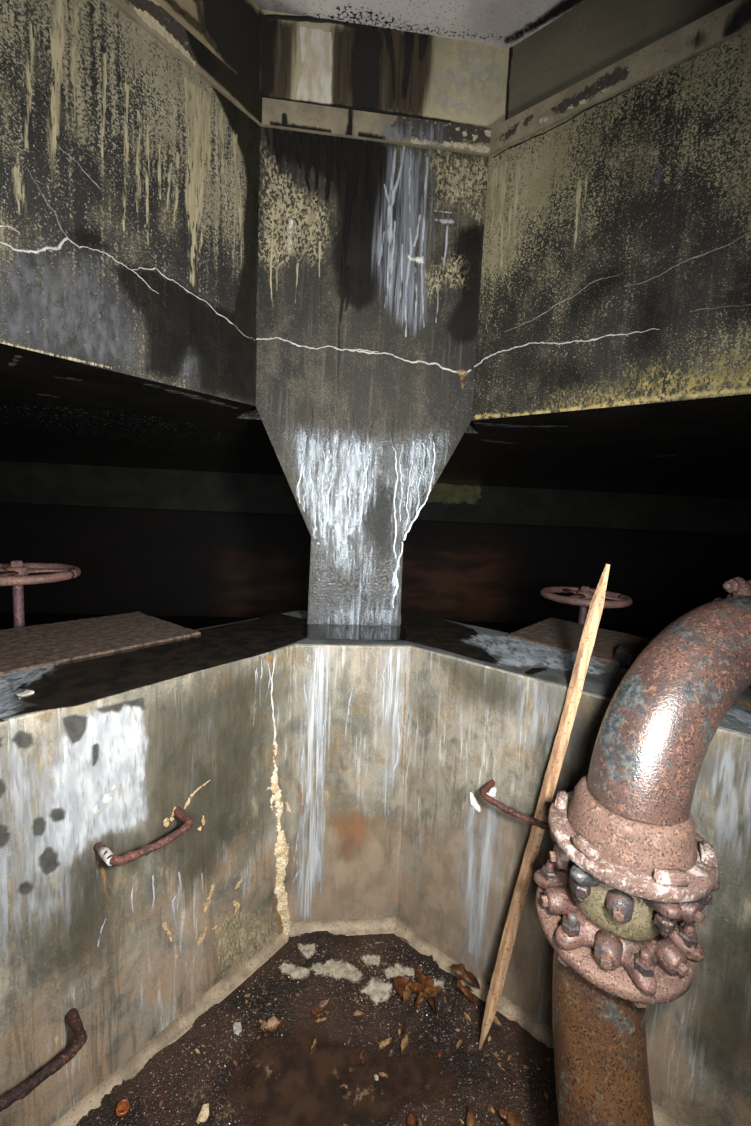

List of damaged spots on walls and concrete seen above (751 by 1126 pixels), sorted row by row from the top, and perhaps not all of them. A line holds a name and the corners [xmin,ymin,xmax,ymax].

leakage [13,166,24,213]
leakage [25,23,36,148]
leakage [50,0,79,158]
crack [57,144,101,190]
leakage [121,0,584,409]
crack [0,167,750,374]
leakage [474,388,751,444]
leakage [297,409,604,803]
leakage [0,612,308,930]
crack [267,658,291,935]
leakage [293,647,387,918]
leakage [410,788,519,994]